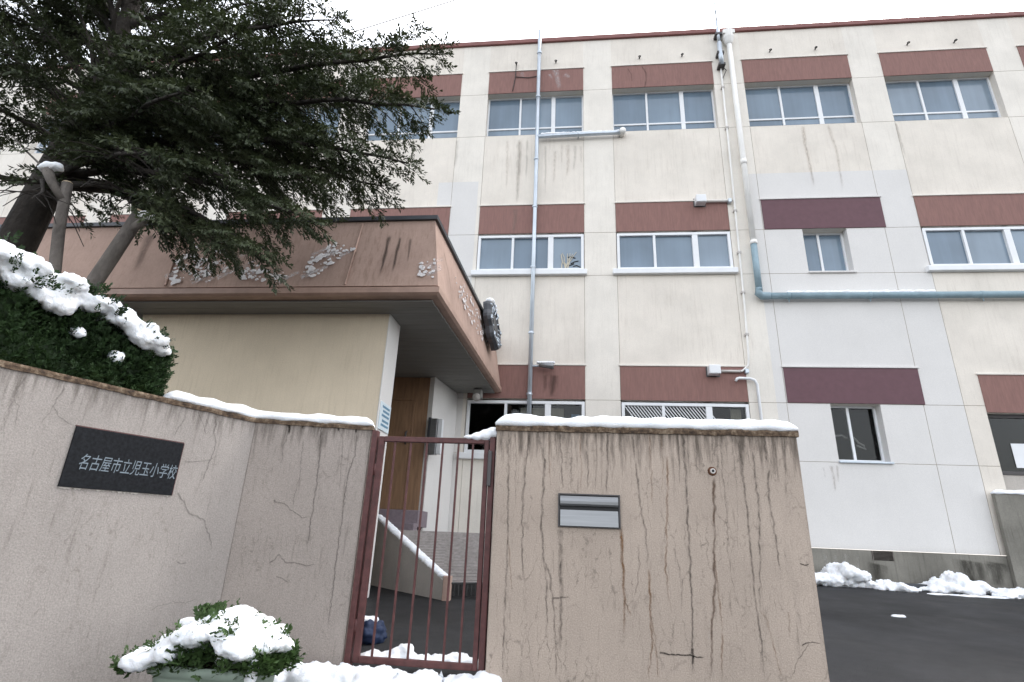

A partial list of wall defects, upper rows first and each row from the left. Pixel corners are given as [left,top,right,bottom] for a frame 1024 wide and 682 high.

peeling [169,242,356,286]
peeling [417,258,436,278]
peeling [455,277,488,345]
crack [660,649,703,664]